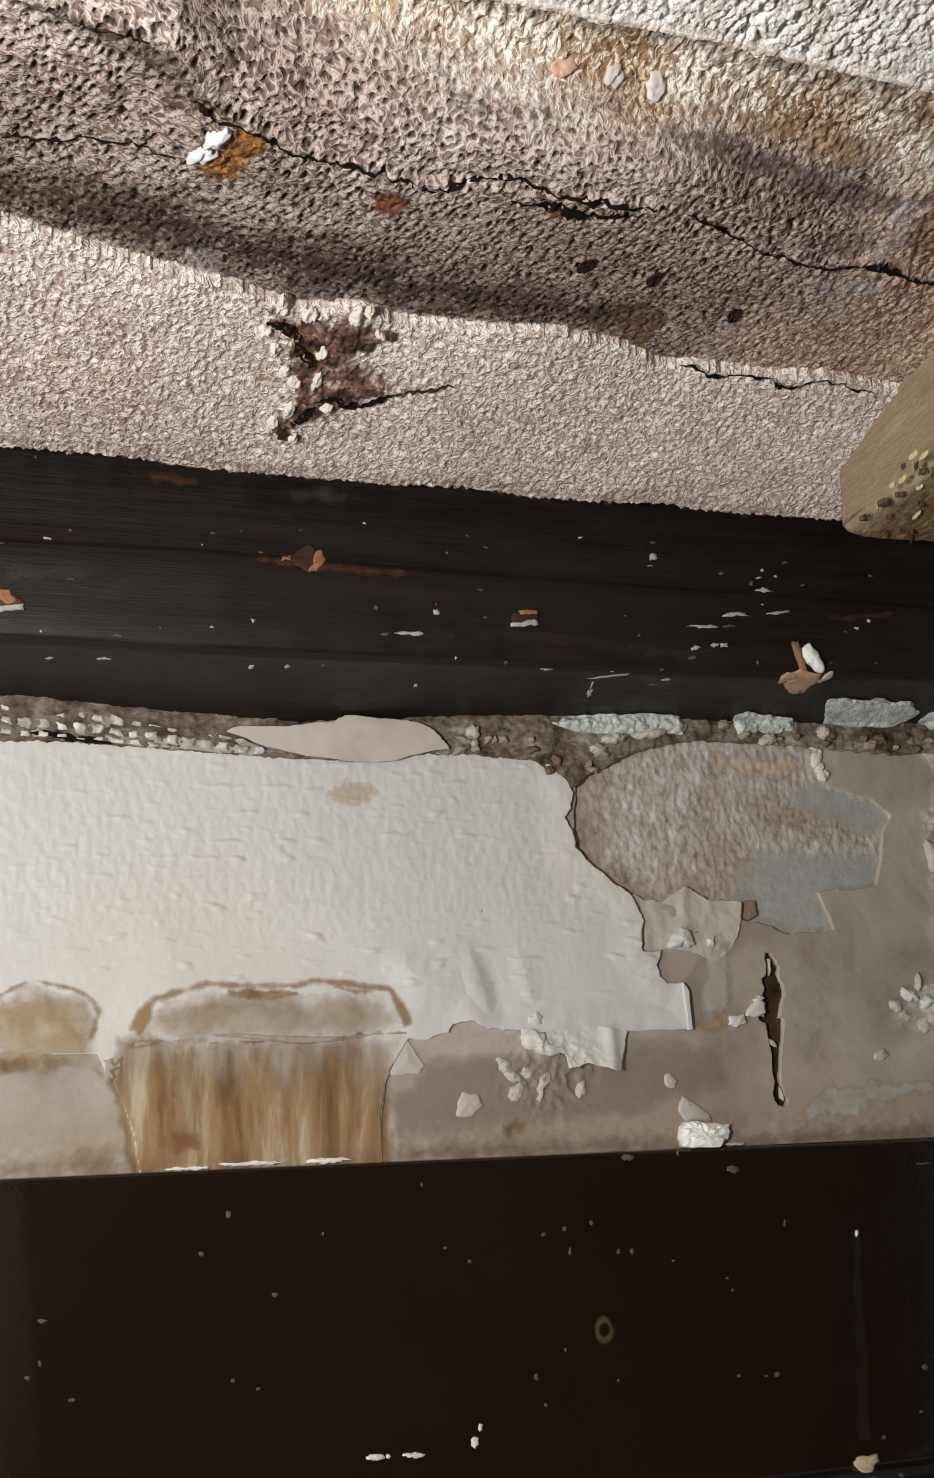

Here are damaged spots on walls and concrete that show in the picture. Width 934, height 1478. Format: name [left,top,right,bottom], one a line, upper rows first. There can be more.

crack [81,23,148,44]
water stain [29,4,226,119]
crack [1,132,176,160]
water stain [0,171,668,349]
spalling [0,0,934,445]
crack [194,101,934,286]
water stain [663,127,934,258]
peeling [778,641,834,694]
peeling [0,715,890,1121]
water stain [0,982,99,1071]
water stain [112,980,719,1172]